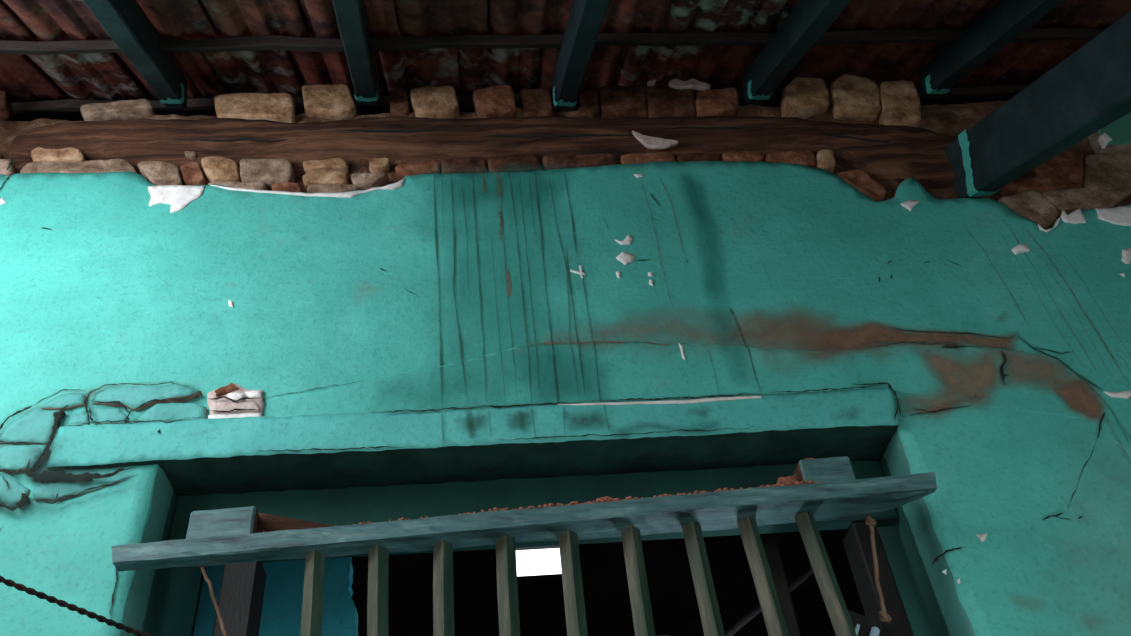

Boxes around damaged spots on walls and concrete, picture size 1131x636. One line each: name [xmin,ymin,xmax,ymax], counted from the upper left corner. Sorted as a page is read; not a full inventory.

peeling [1098,130,1113,148]
peeling [148,178,405,213]
peeling [1037,206,1131,232]
peeling [615,235,635,278]
crack [865,328,1105,520]
spalling [0,382,264,511]